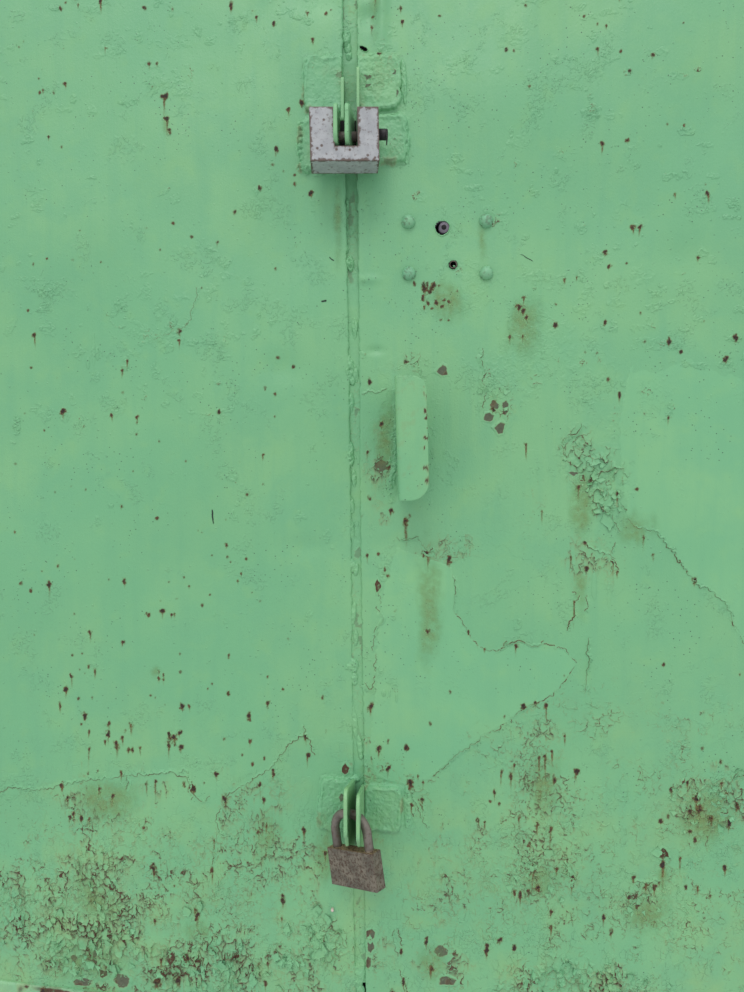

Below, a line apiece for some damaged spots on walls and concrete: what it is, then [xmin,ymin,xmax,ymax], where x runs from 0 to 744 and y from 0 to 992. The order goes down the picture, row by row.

corrosion [413,281,450,321]
peeling [477,354,524,437]
crack [586,498,744,645]
crack [396,535,594,777]
crack [0,767,193,794]
crack [221,723,318,800]
peeling [0,654,744,992]